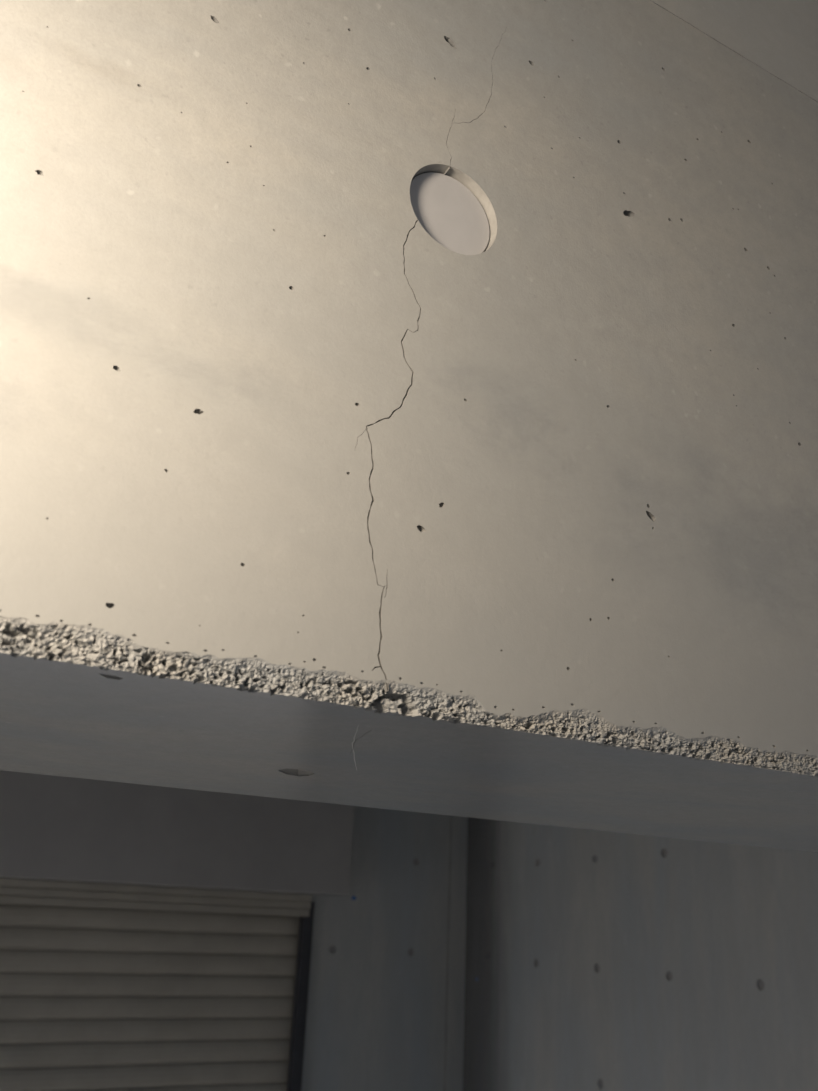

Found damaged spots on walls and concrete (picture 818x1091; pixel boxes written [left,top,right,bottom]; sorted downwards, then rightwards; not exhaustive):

crack [355,223,421,693]